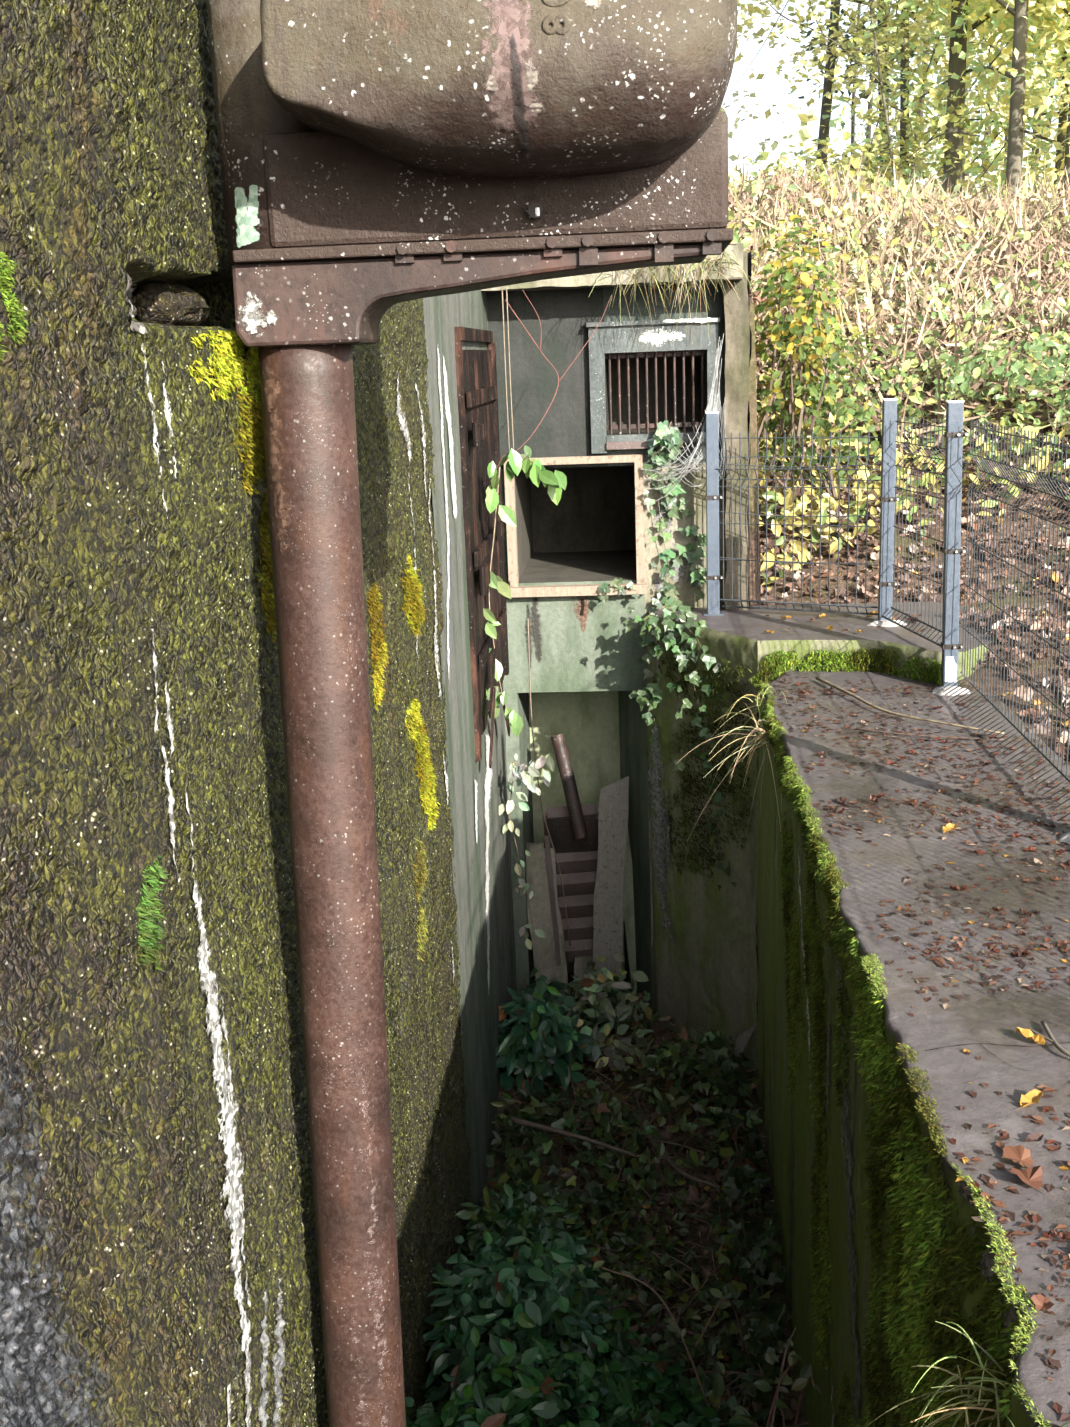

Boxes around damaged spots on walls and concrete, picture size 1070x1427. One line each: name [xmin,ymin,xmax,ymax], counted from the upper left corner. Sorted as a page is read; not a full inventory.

rust [481,0,542,157]
rust [264,368,294,550]
water stain [396,346,457,698]
water stain [475,735,493,994]
water stain [151,629,252,1427]
crack [1034,1419,1061,1427]